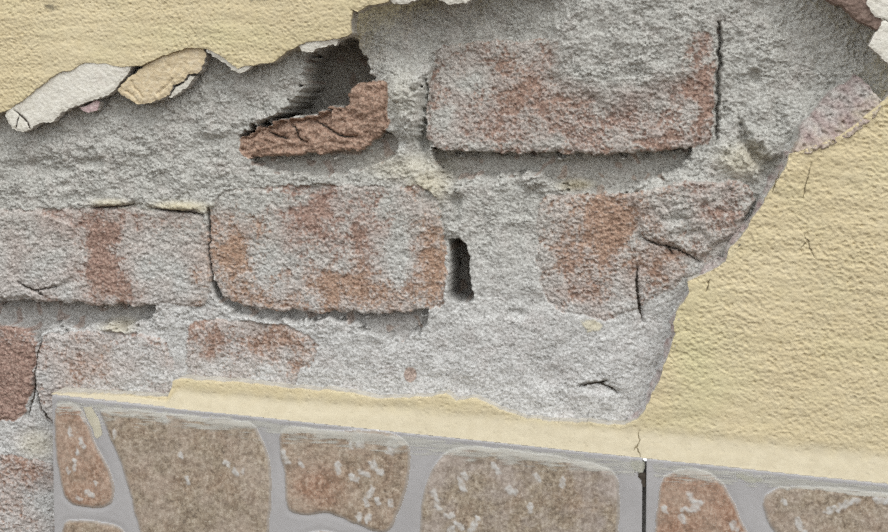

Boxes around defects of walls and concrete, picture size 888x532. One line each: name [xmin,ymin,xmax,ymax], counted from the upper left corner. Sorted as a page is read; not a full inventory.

spalling [825,0,888,65]
spalling [5,48,254,132]
spalling [243,39,376,137]
spalling [701,74,882,274]
spalling [449,238,474,304]
spalling [628,314,679,421]